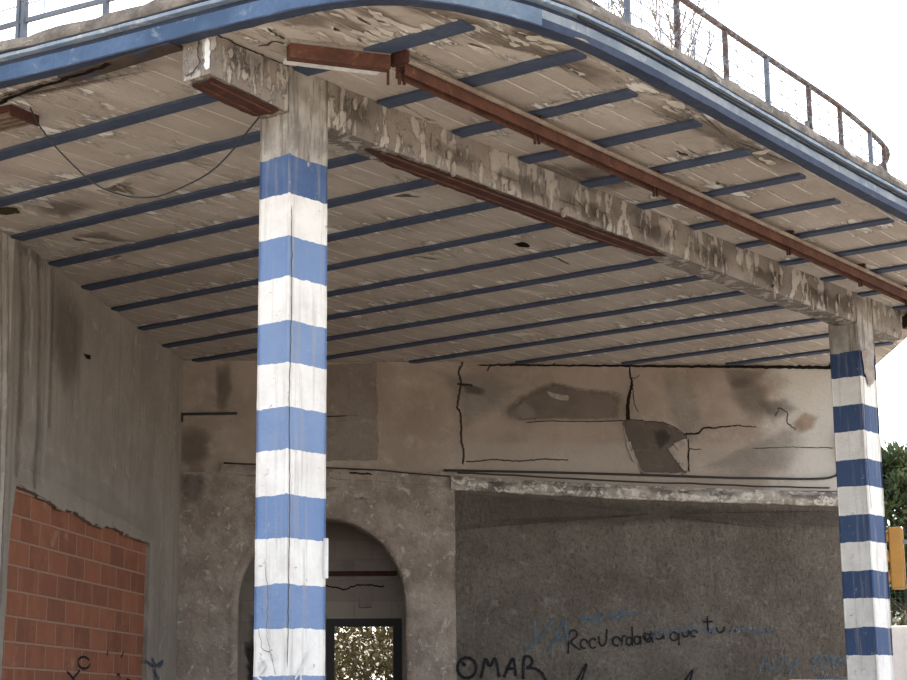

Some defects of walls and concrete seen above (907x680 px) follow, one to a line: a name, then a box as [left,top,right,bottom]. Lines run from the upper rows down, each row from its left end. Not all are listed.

peeling [78,161,217,201]
corrosion [365,149,667,257]
peeling [752,149,776,165]
flaking render [509,383,687,475]
crack [456,362,832,472]